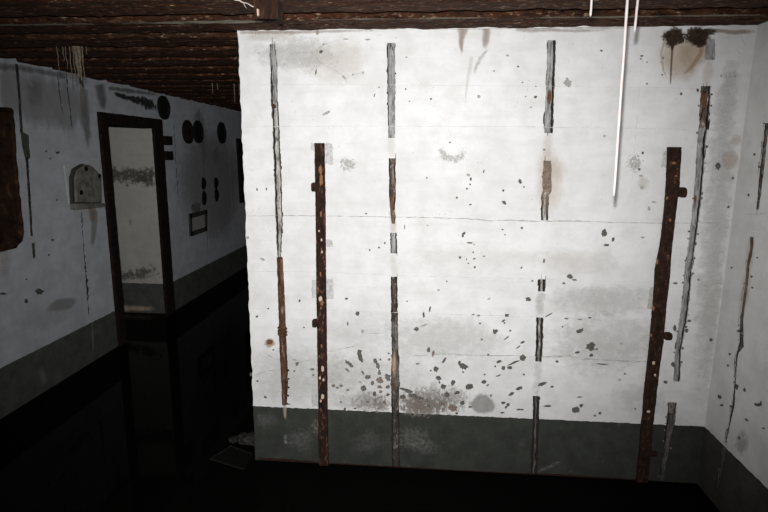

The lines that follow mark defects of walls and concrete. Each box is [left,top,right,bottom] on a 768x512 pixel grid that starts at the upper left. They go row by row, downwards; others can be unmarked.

mould [661,27,716,50]
spalling [727,238,758,392]